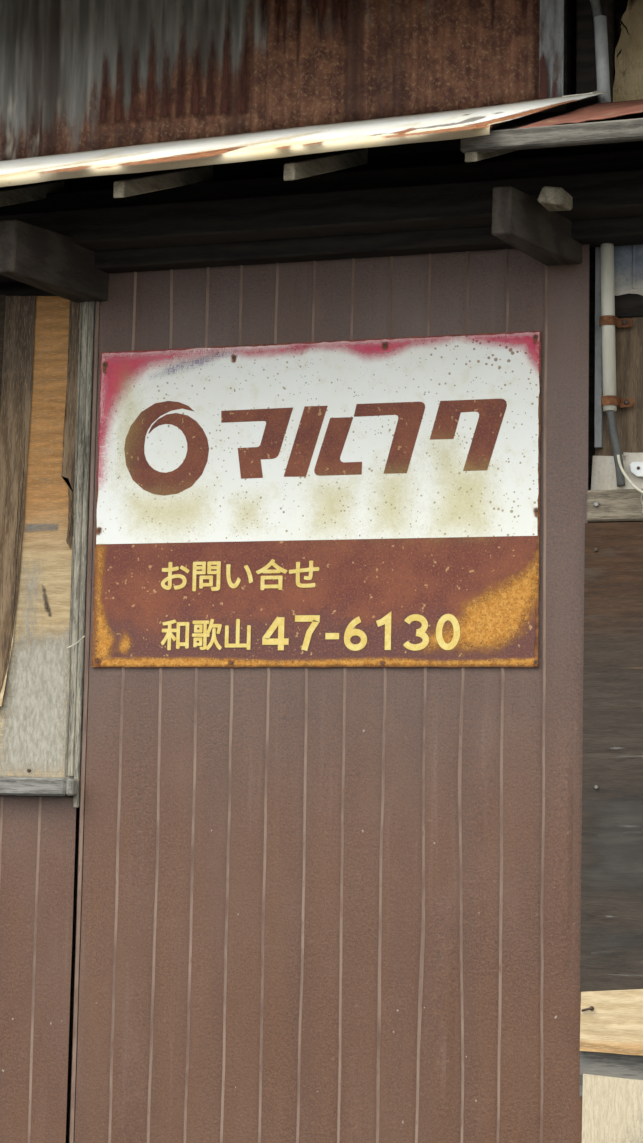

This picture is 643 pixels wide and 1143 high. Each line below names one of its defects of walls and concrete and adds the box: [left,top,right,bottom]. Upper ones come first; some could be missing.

corrosion [100,12,249,124]
corrosion [261,0,348,58]